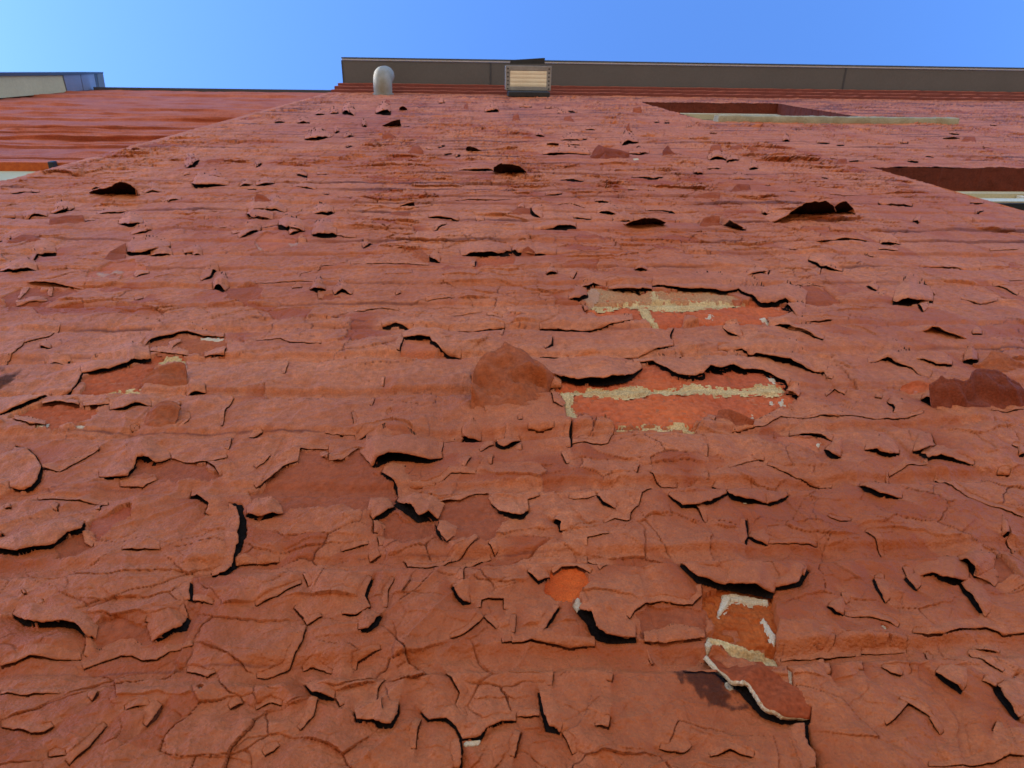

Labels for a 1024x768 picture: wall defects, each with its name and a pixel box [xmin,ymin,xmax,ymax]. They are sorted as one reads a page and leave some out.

crack [0,446,109,537]
flaking render [0,321,227,430]
crack [83,393,152,411]
crack [186,375,271,468]
peeling [211,422,539,578]
crack [410,414,572,490]
flaking render [463,270,840,446]
crack [632,315,1024,767]
crack [0,587,216,767]
crack [228,533,512,757]
crack [509,690,610,758]
flaking render [507,560,817,768]